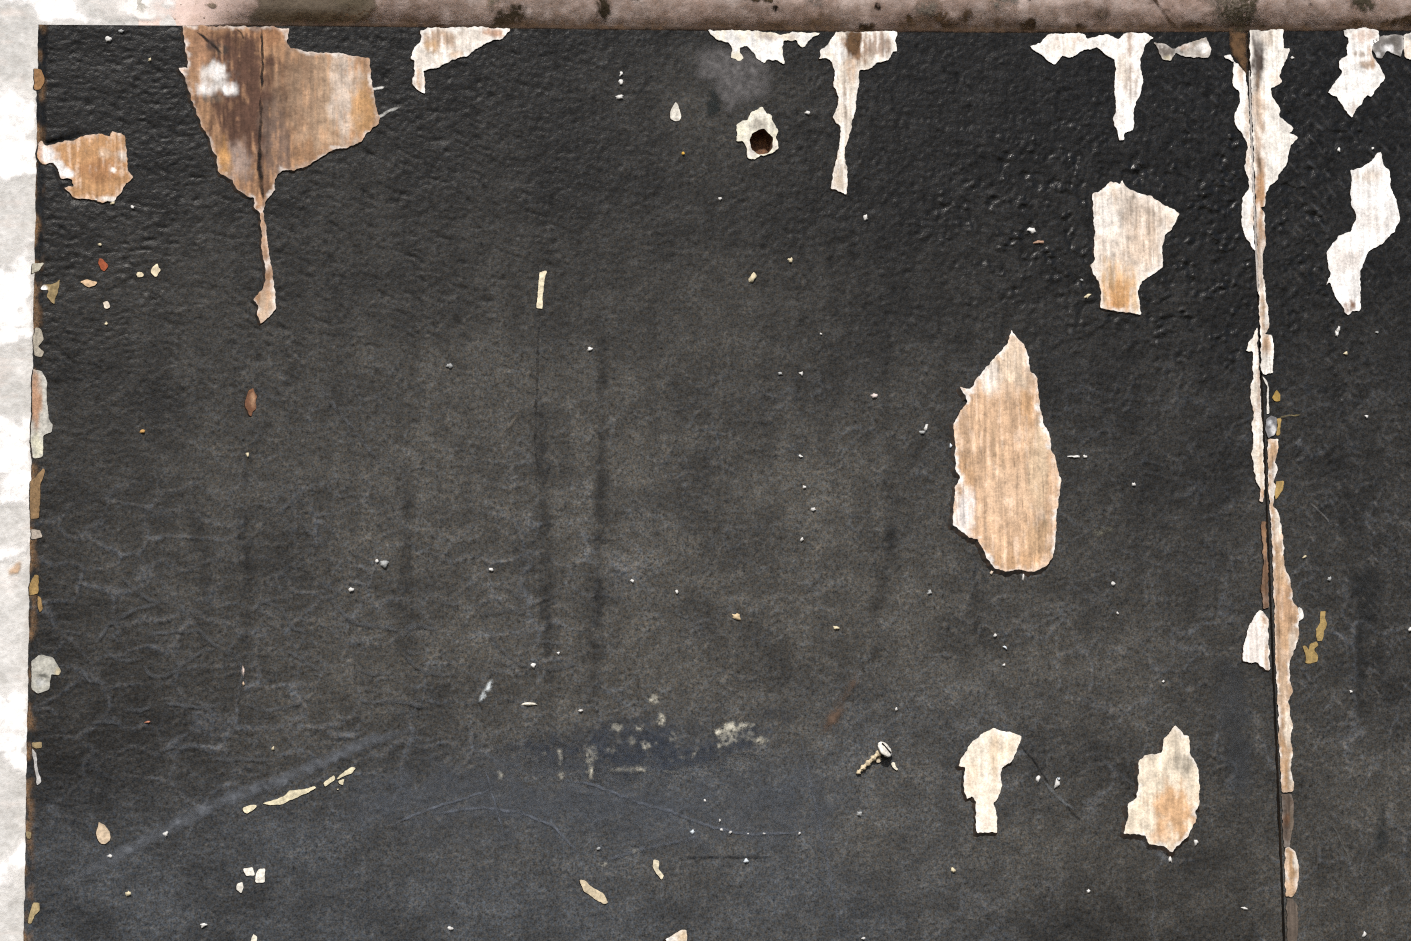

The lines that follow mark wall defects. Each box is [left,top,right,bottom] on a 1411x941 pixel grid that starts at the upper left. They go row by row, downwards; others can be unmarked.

peeling [35,131,133,205]
peeling [176,25,380,326]
peeling [409,26,510,94]
peeling [708,29,897,196]
peeling [1325,152,1400,316]
peeling [1327,27,1411,119]
peeling [948,330,1061,577]
peeling [1030,29,1327,941]
peeling [954,728,1021,837]